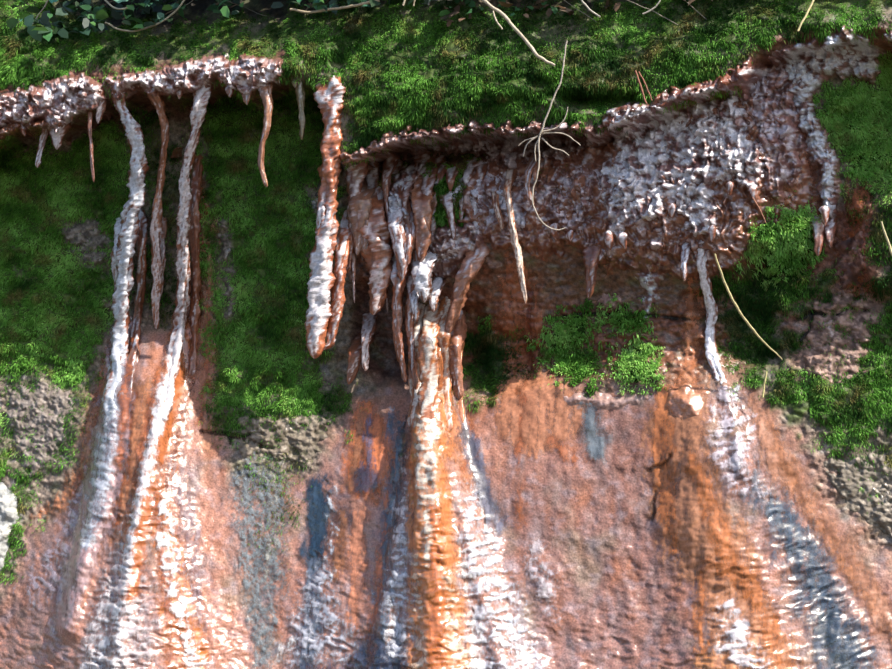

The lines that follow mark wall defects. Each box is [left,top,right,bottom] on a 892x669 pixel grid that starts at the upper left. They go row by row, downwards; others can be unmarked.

damp [340,25,892,319]
corrosion [31,343,111,519]
damp [27,312,207,669]
corrosion [109,376,155,555]
corrosion [151,181,221,669]
corrosion [332,401,396,644]
damp [229,388,542,669]
corrosion [449,405,478,489]
damp [527,539,561,623]
corrosion [642,275,803,669]
damp [709,380,880,669]
corrosion [739,387,892,645]